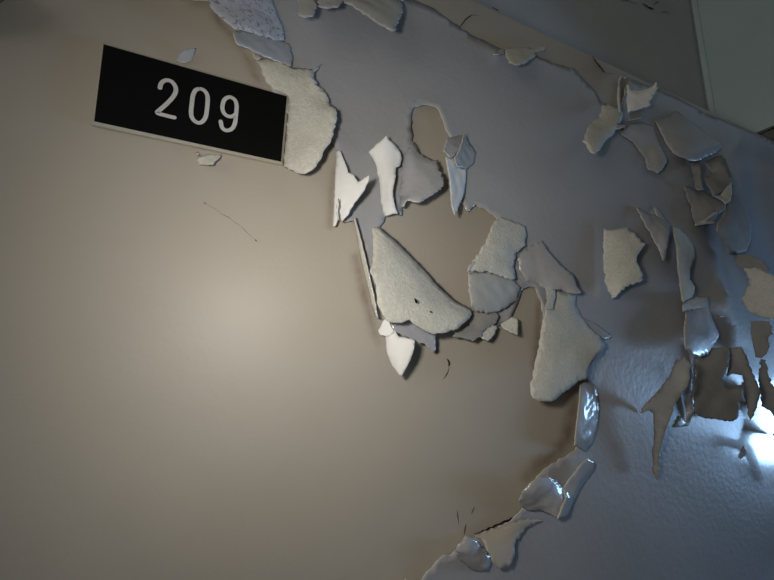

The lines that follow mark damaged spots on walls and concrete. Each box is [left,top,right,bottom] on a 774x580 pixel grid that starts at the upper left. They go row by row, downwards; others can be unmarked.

peeling [175,48,196,63]
peeling [192,0,774,580]